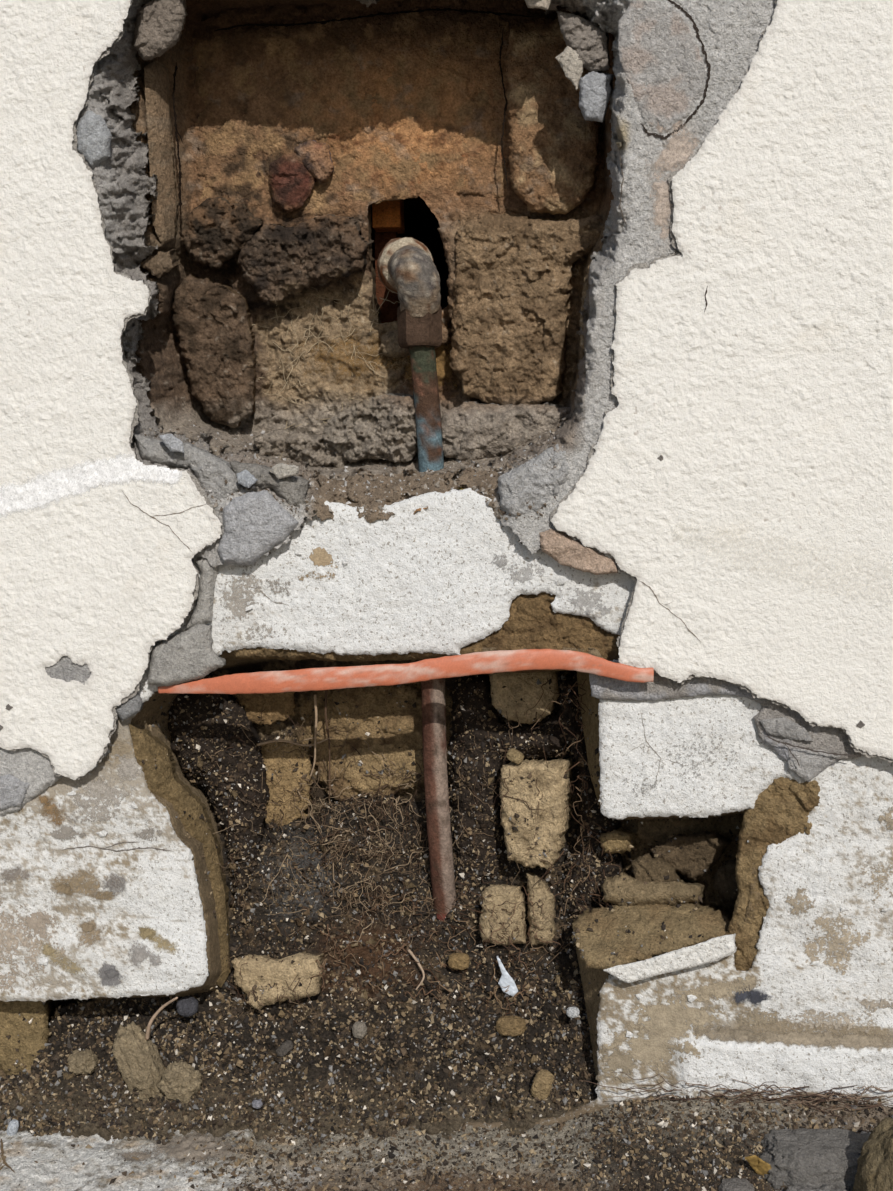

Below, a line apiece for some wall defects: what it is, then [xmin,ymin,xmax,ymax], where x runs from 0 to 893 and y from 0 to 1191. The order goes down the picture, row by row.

crack [640,0,711,139]
corrosion [435,341,458,388]
spalling [45,0,776,1010]
flaking render [0,747,63,816]
spalling [445,669,893,1083]
spalling [0,898,108,1079]
spalling [530,1069,554,1100]